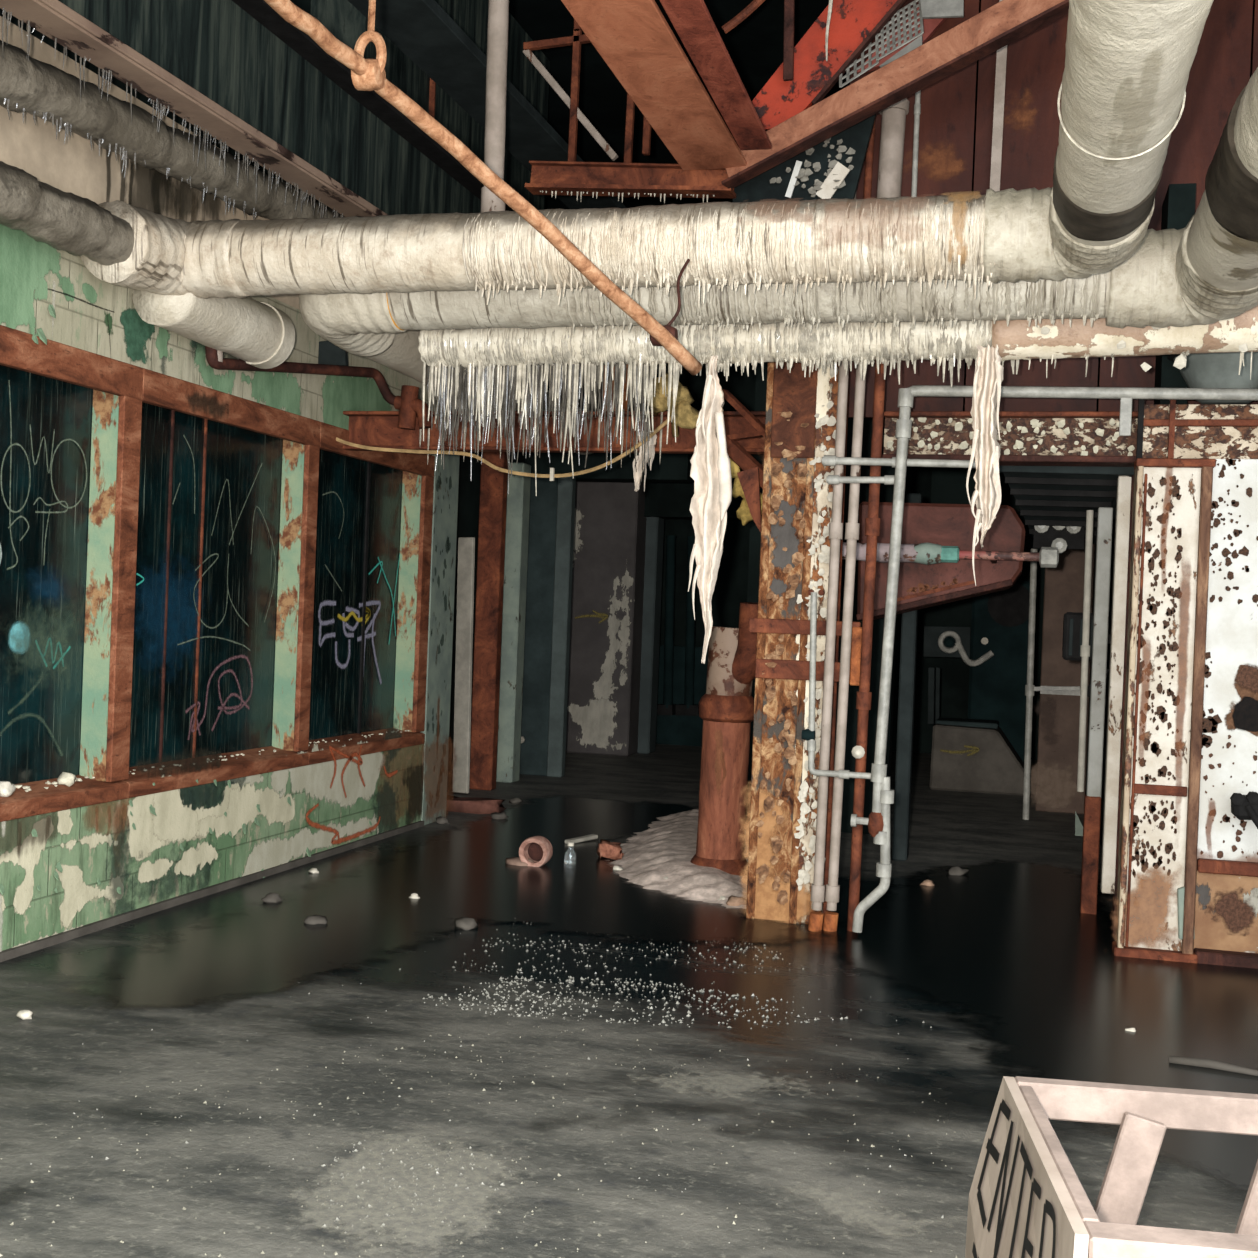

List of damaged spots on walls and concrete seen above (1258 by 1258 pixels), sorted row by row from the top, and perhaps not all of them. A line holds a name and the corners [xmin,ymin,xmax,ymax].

peeling [0,224,113,345]
peeling [155,327,173,362]
peeling [190,342,304,415]
peeling [321,375,392,430]
peeling [573,507,584,561]
peeling [567,563,635,751]
corrosion [1132,470,1190,786]
peeling [0,741,385,948]
corrosion [740,791,811,923]
corrosion [1115,800,1177,947]
peeling [1195,883,1258,936]